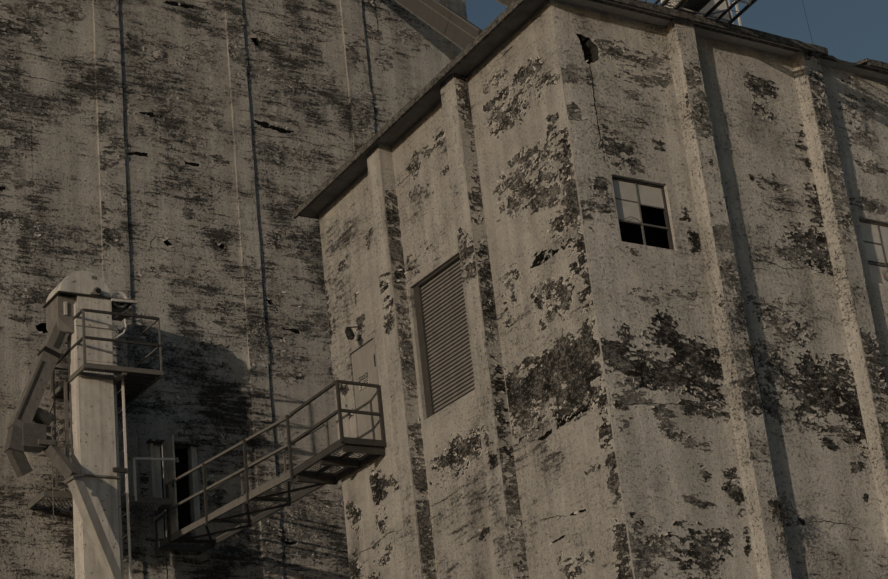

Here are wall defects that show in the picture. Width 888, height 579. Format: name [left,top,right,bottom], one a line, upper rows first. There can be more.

peeling [0,0,86,69]
spalling [0,179,35,191]
peeling [98,108,148,171]
peeling [124,93,224,132]
peeling [209,154,230,167]
peeling [253,113,311,172]
peeling [481,34,714,142]
peeling [0,206,51,239]
spalling [379,51,888,579]
peeling [261,469,399,579]